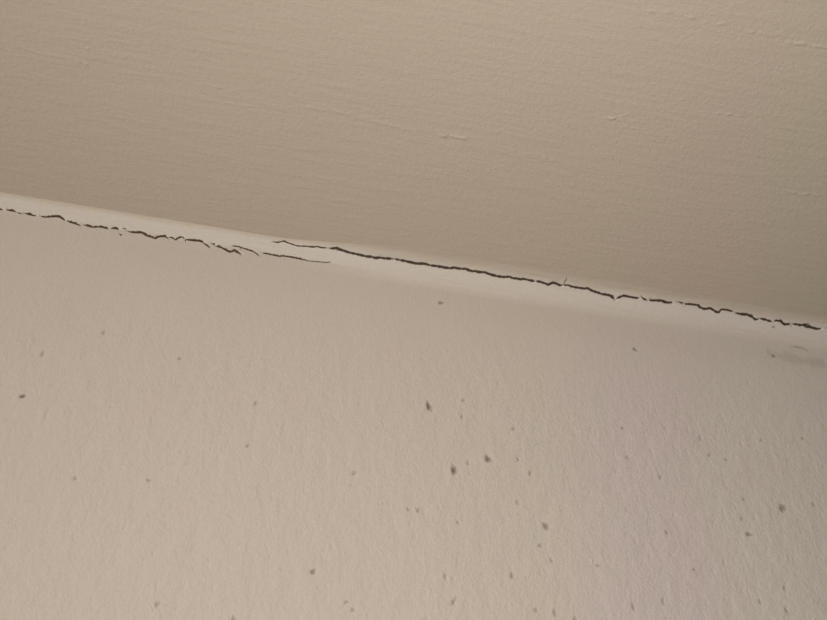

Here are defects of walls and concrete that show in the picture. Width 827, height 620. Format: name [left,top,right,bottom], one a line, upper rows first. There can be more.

crack [0,208,821,330]